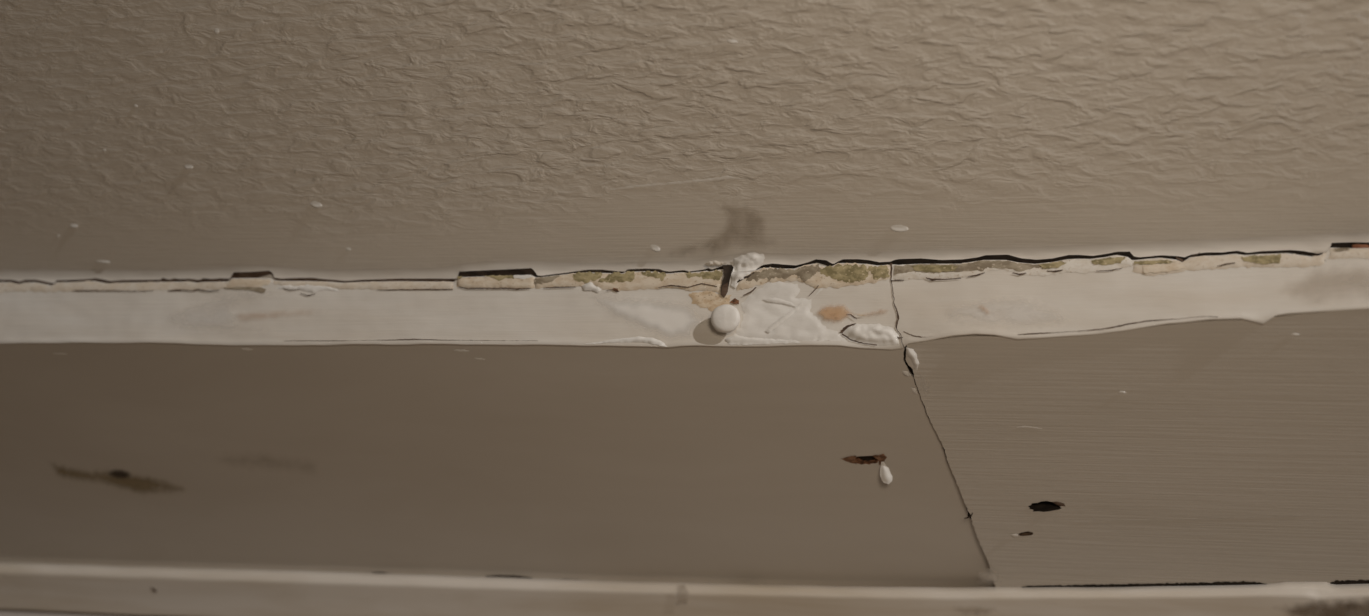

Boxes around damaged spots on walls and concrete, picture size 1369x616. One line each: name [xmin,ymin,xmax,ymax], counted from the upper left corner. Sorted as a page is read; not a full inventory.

peeling [0,248,1369,311]
crack [0,242,1369,394]
peeling [840,323,899,346]
leakage [58,469,167,490]
crack [983,573,1263,587]
crack [1331,578,1369,586]
leakage [1292,602,1369,616]